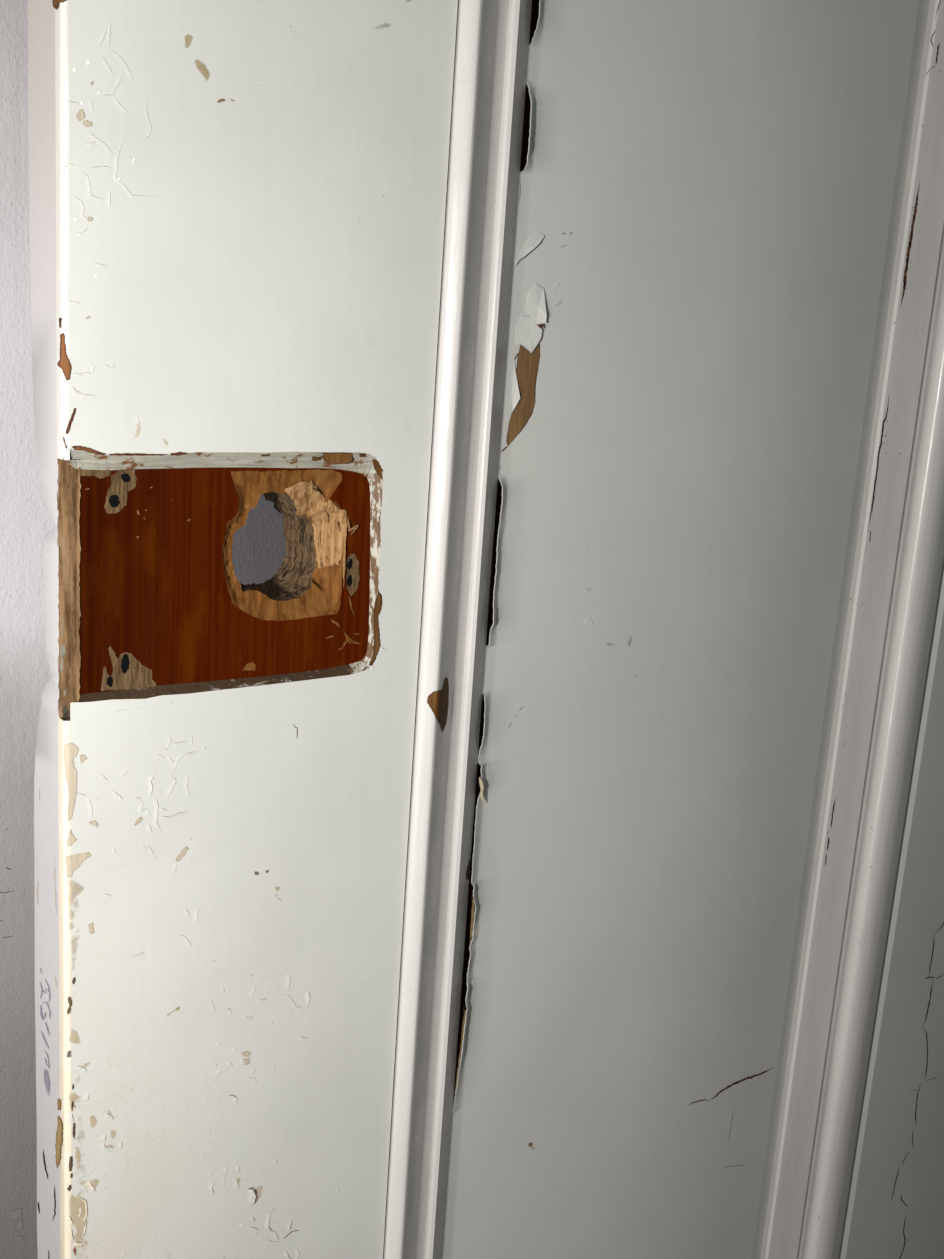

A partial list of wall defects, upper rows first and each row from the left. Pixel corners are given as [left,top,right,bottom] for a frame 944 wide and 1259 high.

peeling [501,283,547,452]
peeling [427,677,449,732]
peeling [54,743,91,917]
peeling [37,1063,98,1248]
peeling [90,1111,122,1152]
crack [689,1068,772,1105]
crack [891,923,944,1259]